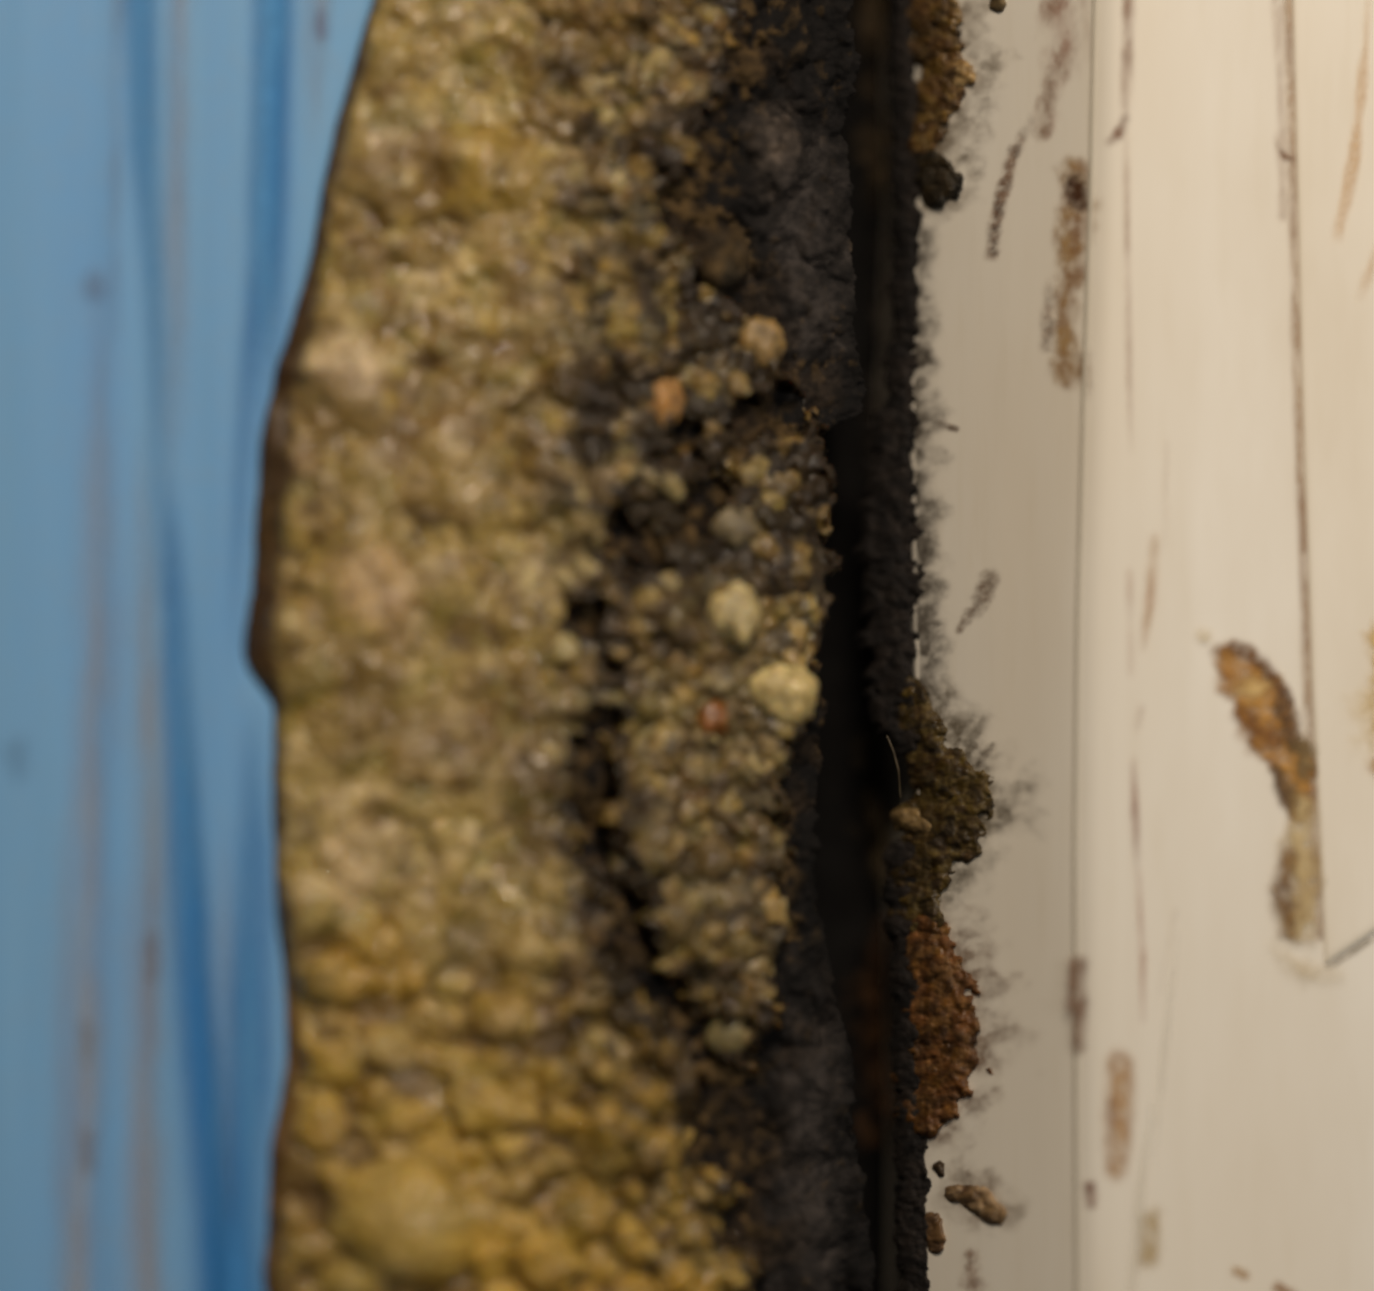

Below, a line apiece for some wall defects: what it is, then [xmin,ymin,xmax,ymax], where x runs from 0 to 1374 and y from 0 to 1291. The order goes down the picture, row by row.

water stain [853,0,995,1291]
rust [1216,643,1319,940]